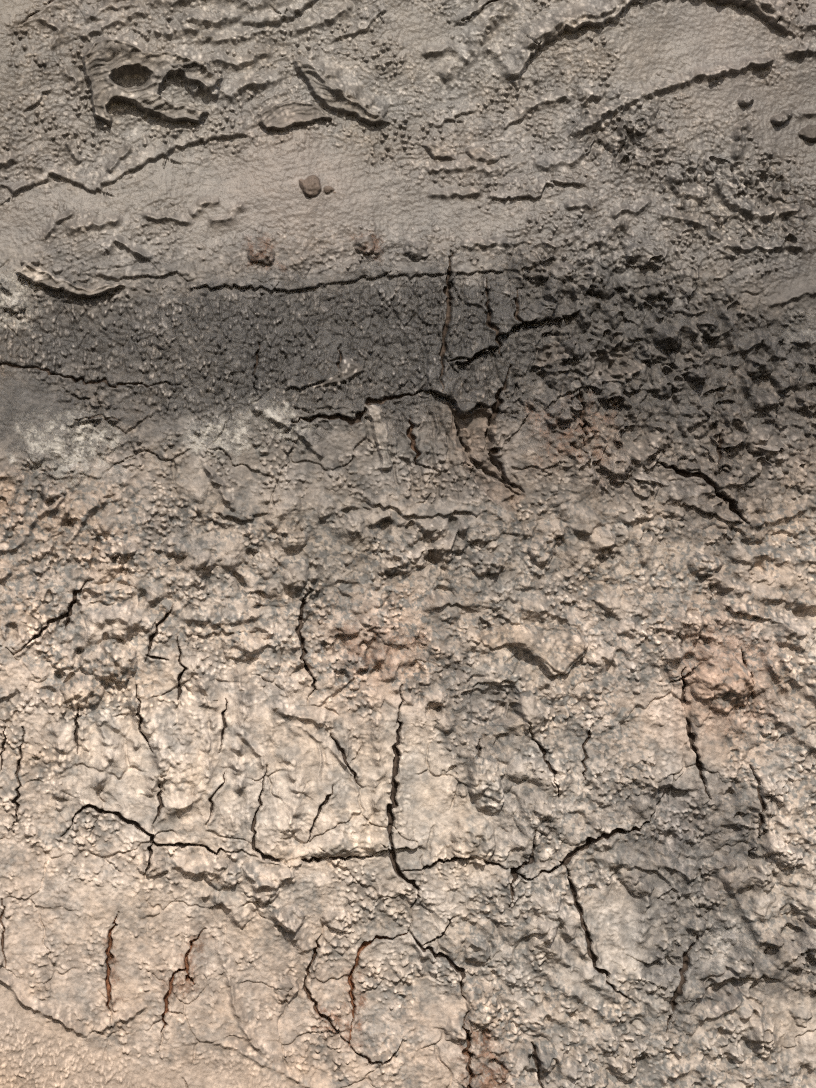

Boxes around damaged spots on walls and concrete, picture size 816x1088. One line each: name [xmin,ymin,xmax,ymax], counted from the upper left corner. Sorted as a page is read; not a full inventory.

peeling [15,262,125,298]
peeling [364,404,393,471]
spalling [444,402,526,512]
crack [27,586,83,644]
crack [72,698,228,874]
crack [136,604,187,753]
crack [251,686,654,997]
peeling [467,623,585,726]
spalling [653,783,704,852]
crack [669,667,709,796]
crack [303,919,473,1088]
spalling [698,965,746,1018]